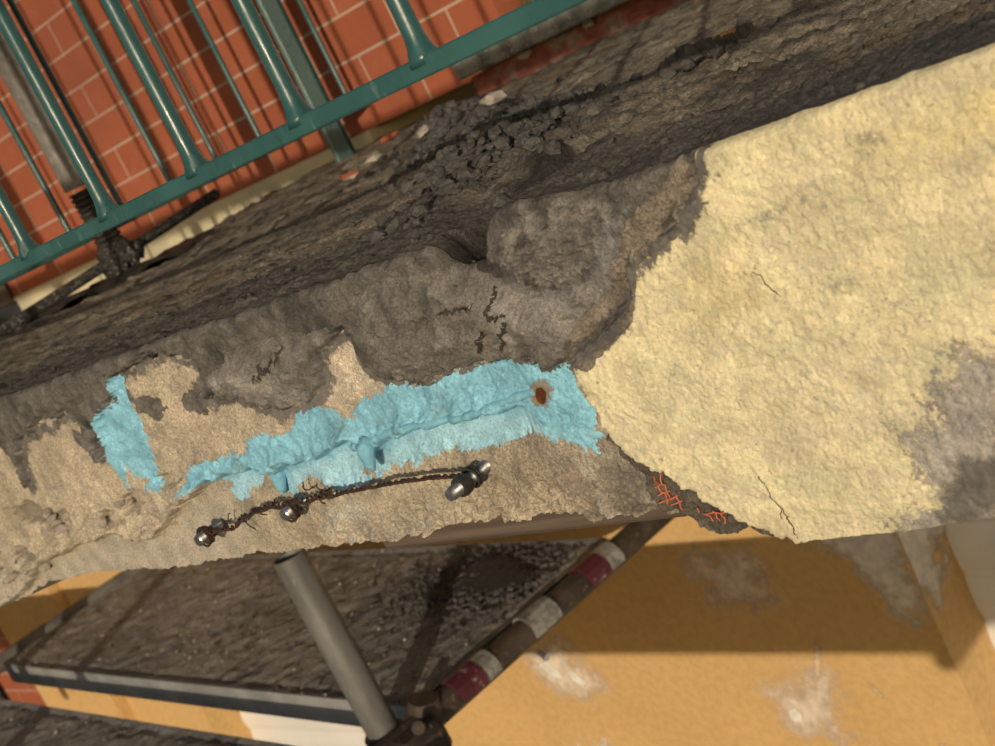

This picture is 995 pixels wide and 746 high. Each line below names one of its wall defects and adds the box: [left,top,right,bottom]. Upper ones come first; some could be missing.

spalling [556,154,699,376]
spalling [0,329,774,608]
corrosion [531,379,552,406]